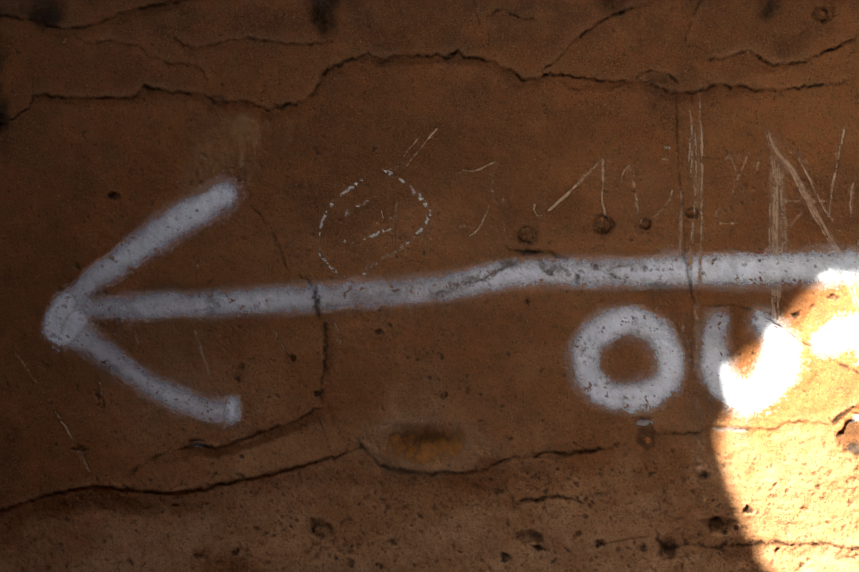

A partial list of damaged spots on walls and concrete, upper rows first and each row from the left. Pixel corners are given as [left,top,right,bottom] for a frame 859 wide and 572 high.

crack [579,8,633,38]
crack [414,49,490,62]
crack [0,93,65,125]
crack [91,84,219,106]
crack [255,56,361,112]
crack [510,40,851,139]
crack [465,249,579,284]
crack [274,236,327,417]
crack [758,410,858,430]
crack [324,439,506,475]
crack [534,443,619,458]
crack [656,534,801,550]